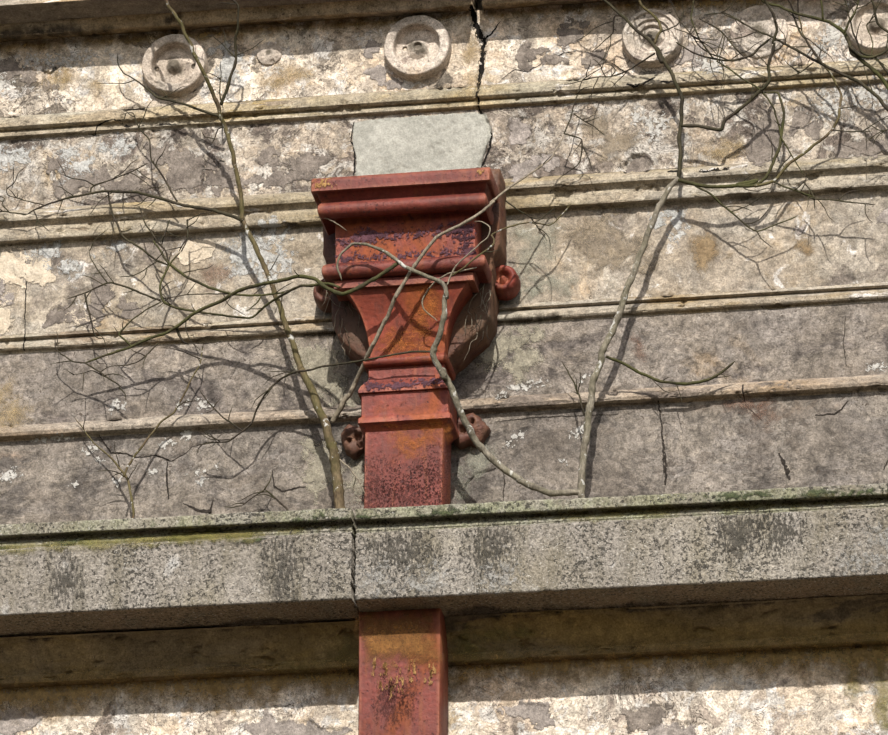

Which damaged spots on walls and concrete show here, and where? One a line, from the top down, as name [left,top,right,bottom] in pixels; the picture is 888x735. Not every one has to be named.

peeling [515,16,608,72]
crack [468,5,576,168]
crack [657,400,667,485]
crack [99,435,214,514]
crack [272,470,306,492]
corrosion [360,612,438,661]
peeling [0,704,48,735]
peeling [243,709,353,735]